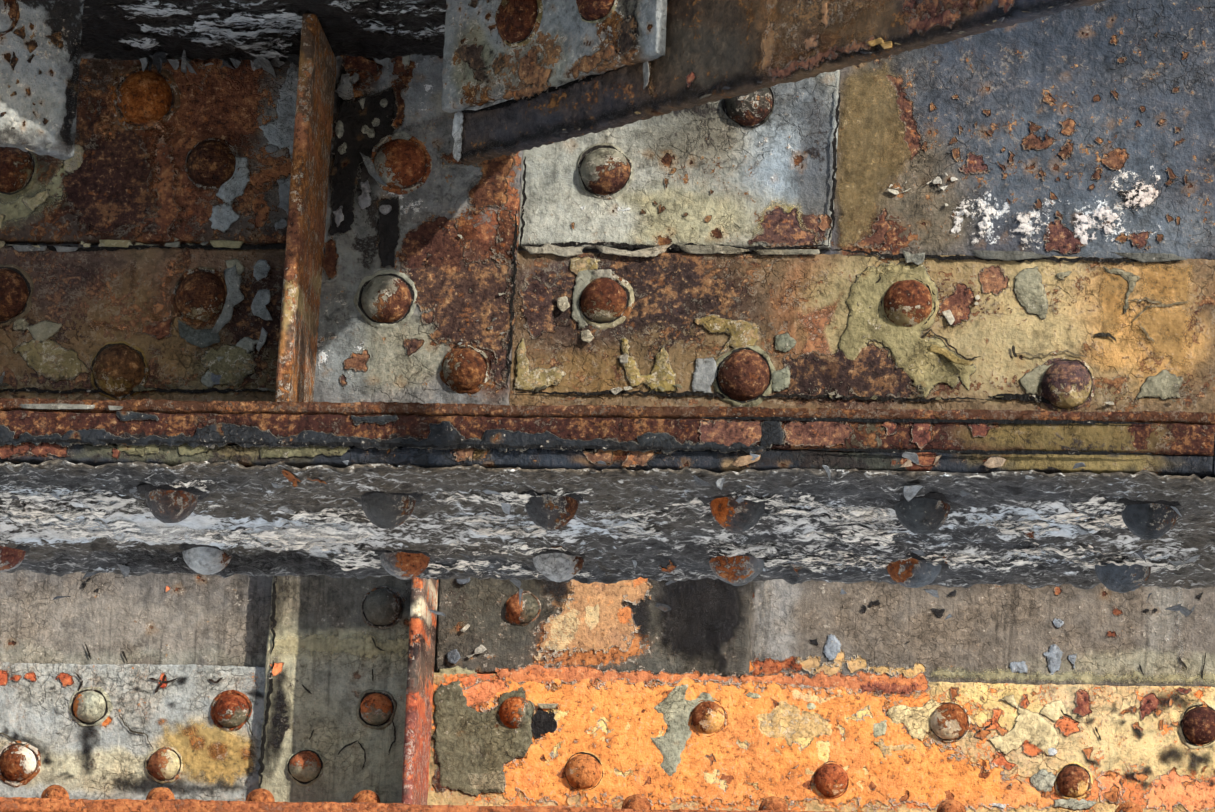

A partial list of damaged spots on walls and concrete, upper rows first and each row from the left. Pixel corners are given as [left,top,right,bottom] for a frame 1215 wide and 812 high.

peeling [452,98,513,162]
peeling [132,156,275,394]
rust [398,150,559,397]
peeling [514,338,566,392]
peeling [610,314,760,395]
rust [782,303,918,402]
peeling [0,403,785,472]
rust [698,419,762,446]
rust [783,417,854,448]
peeling [432,644,558,797]
rust [460,560,1056,812]
rust [1077,765,1215,812]